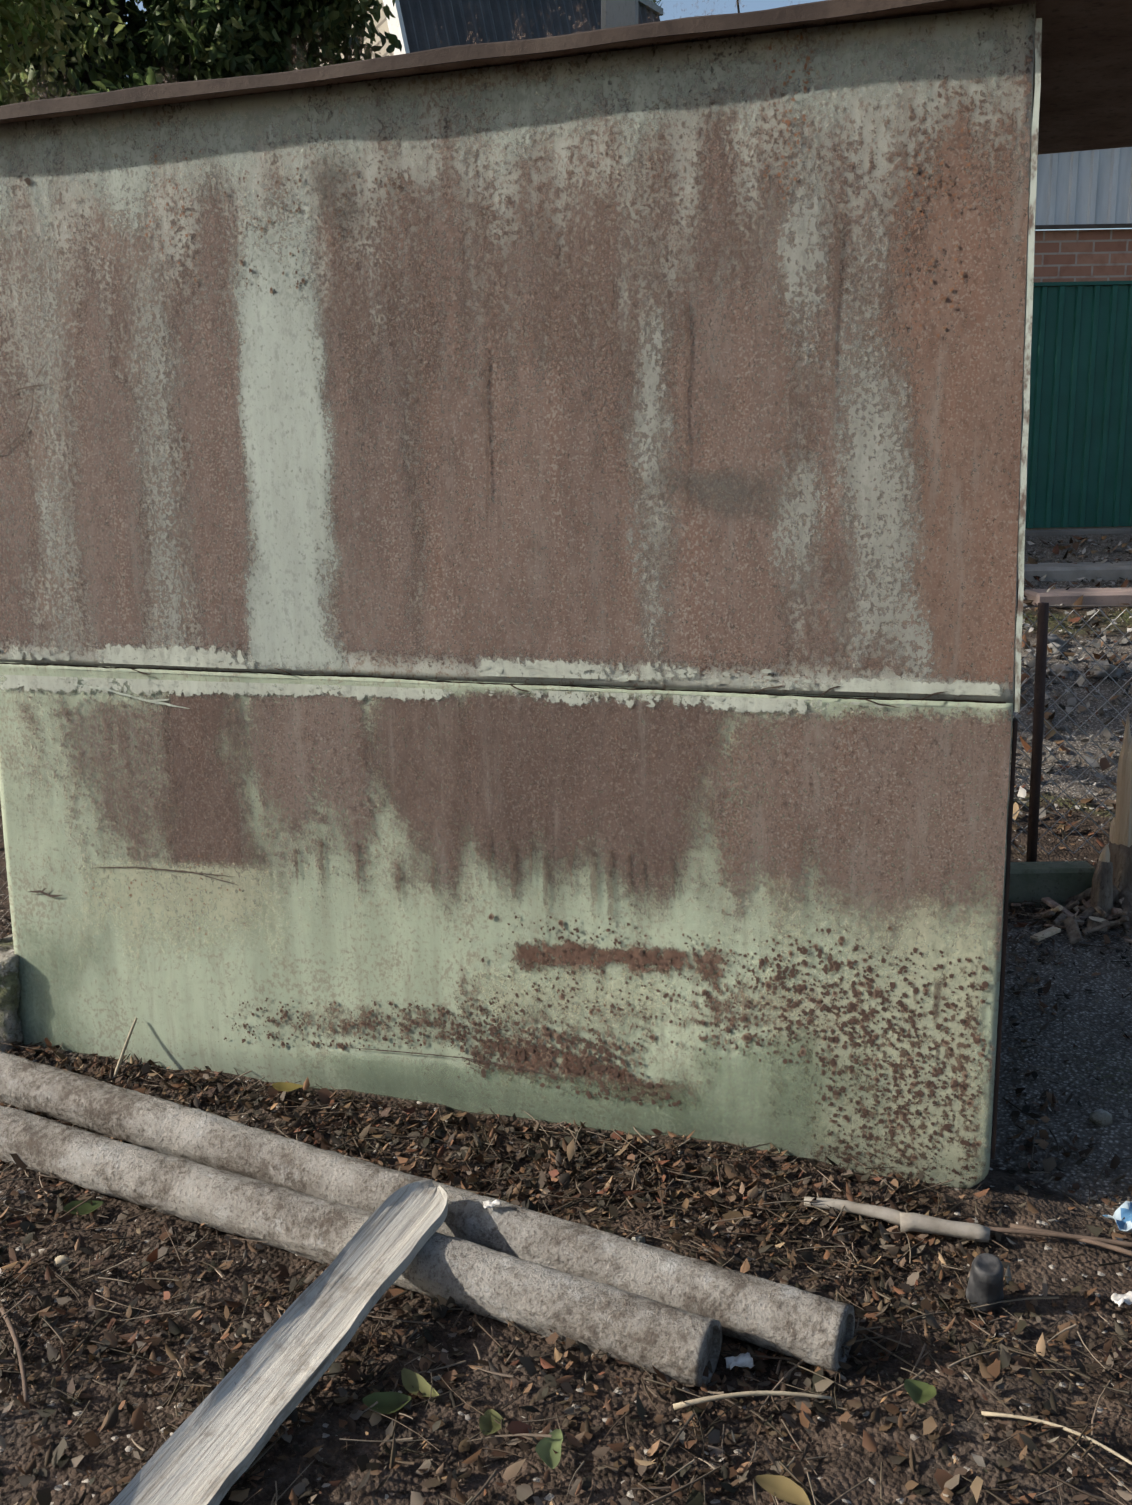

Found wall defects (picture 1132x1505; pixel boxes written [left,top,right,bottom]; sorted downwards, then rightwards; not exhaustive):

rust [0,11,1033,689]
rust [21,690,1011,1186]